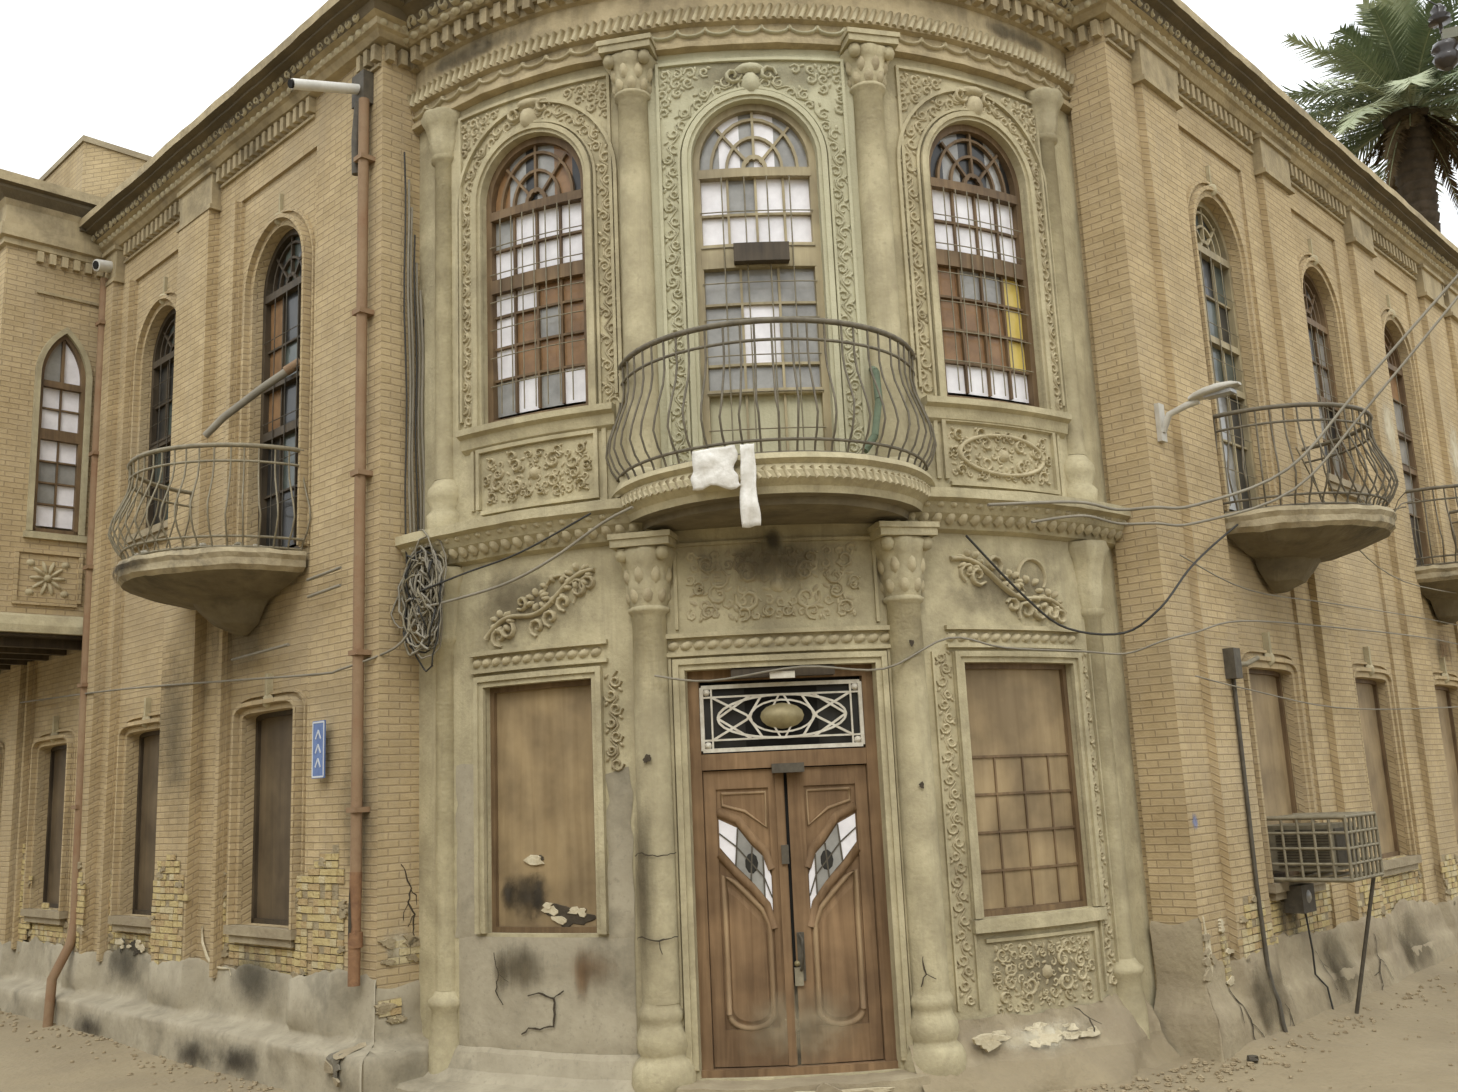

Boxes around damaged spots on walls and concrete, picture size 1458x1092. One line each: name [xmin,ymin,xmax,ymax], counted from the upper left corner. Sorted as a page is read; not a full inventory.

spalling [107,854,188,965]
spalling [221,845,348,978]
leakage [498,950,532,981]
crack [494,954,564,1035]
flaking render [972,1022,1101,1052]